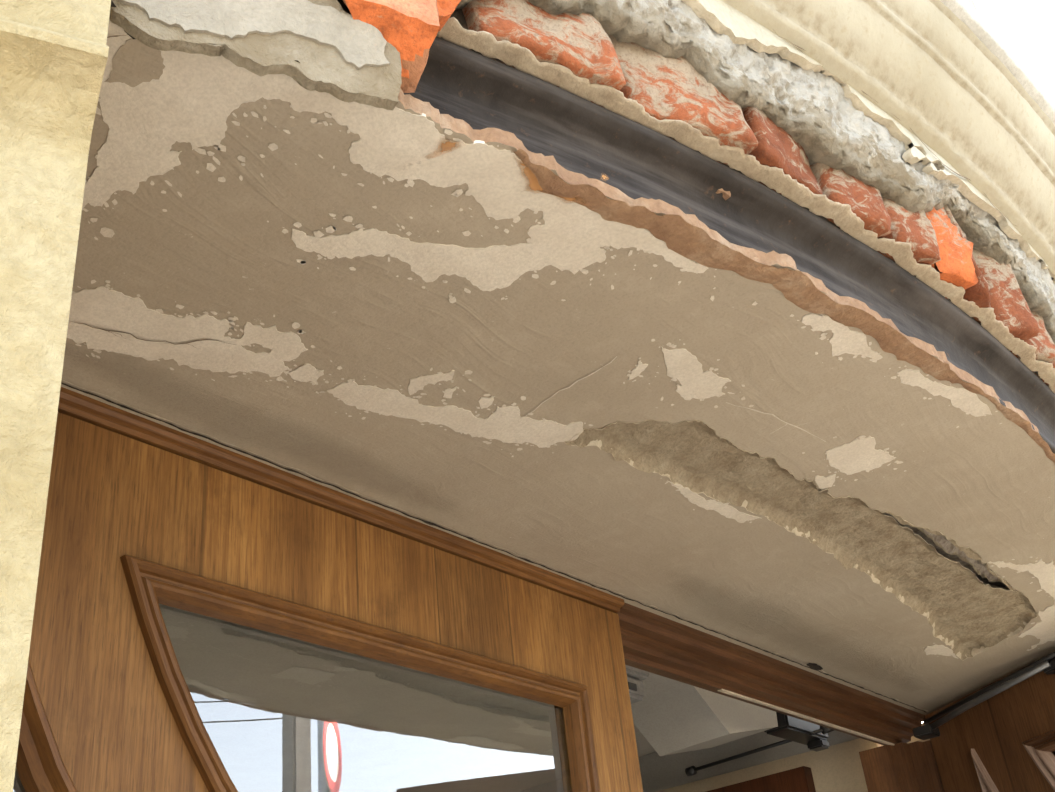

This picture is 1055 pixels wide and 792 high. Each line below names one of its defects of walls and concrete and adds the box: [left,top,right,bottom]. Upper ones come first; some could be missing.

peeling [82,0,1055,464]
spalling [63,280,1055,661]